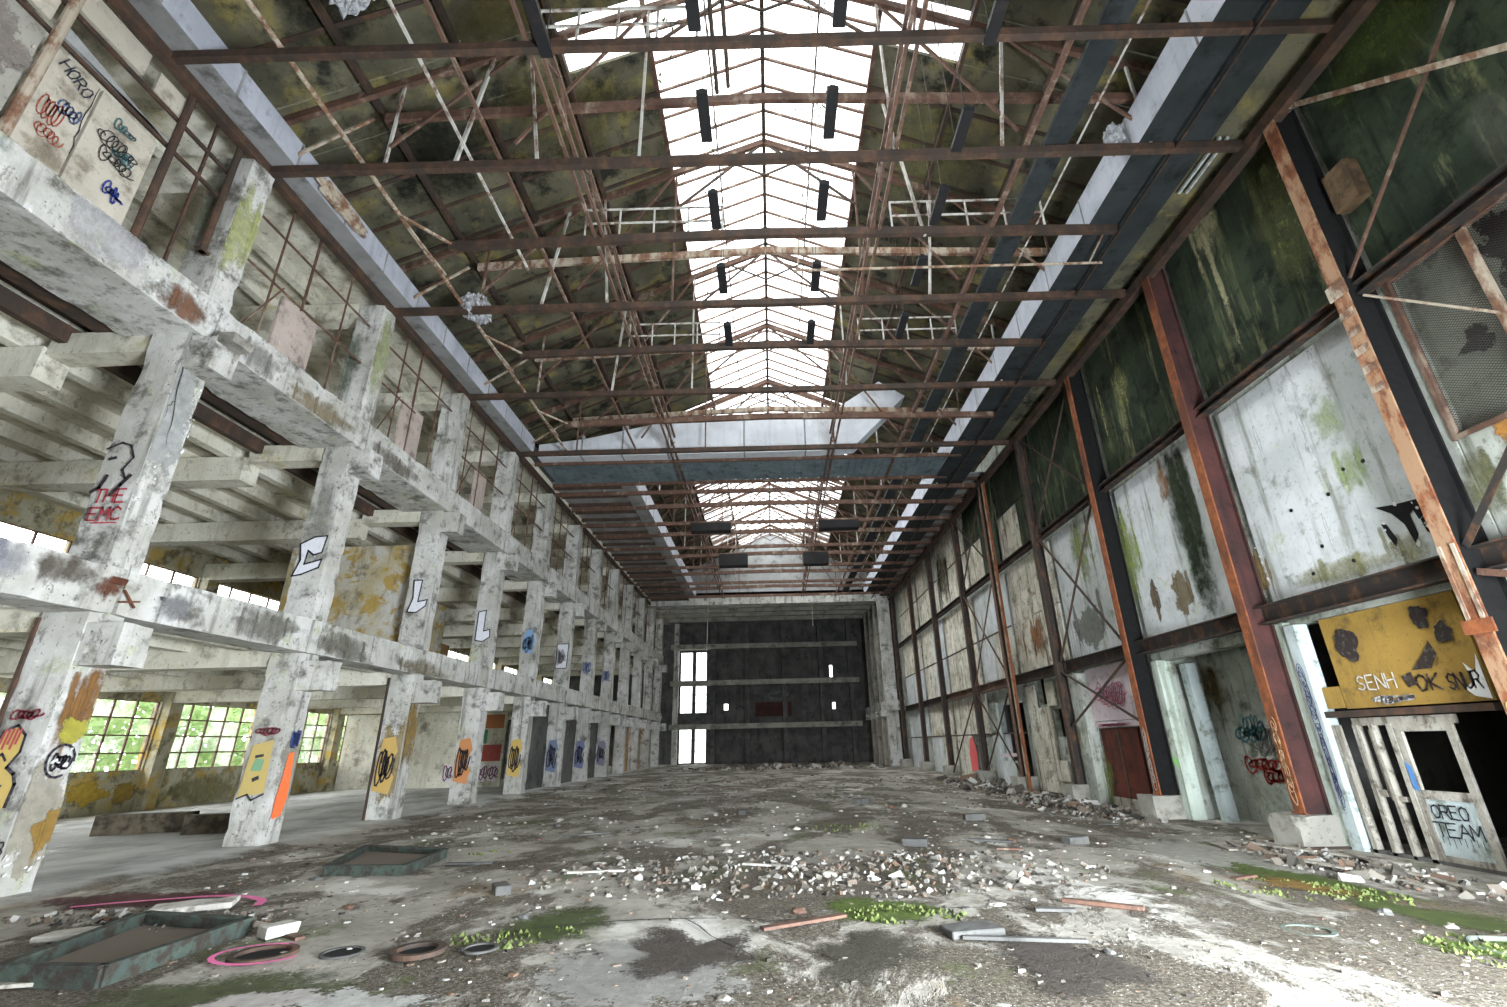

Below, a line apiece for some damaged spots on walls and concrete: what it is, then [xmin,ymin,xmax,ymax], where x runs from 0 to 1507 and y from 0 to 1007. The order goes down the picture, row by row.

water stain [1188,211,1233,318]
water stain [1246,152,1308,278]
water stain [1163,448,1217,614]
water stain [1464,449,1506,507]
corrosion [1493,418,1507,440]